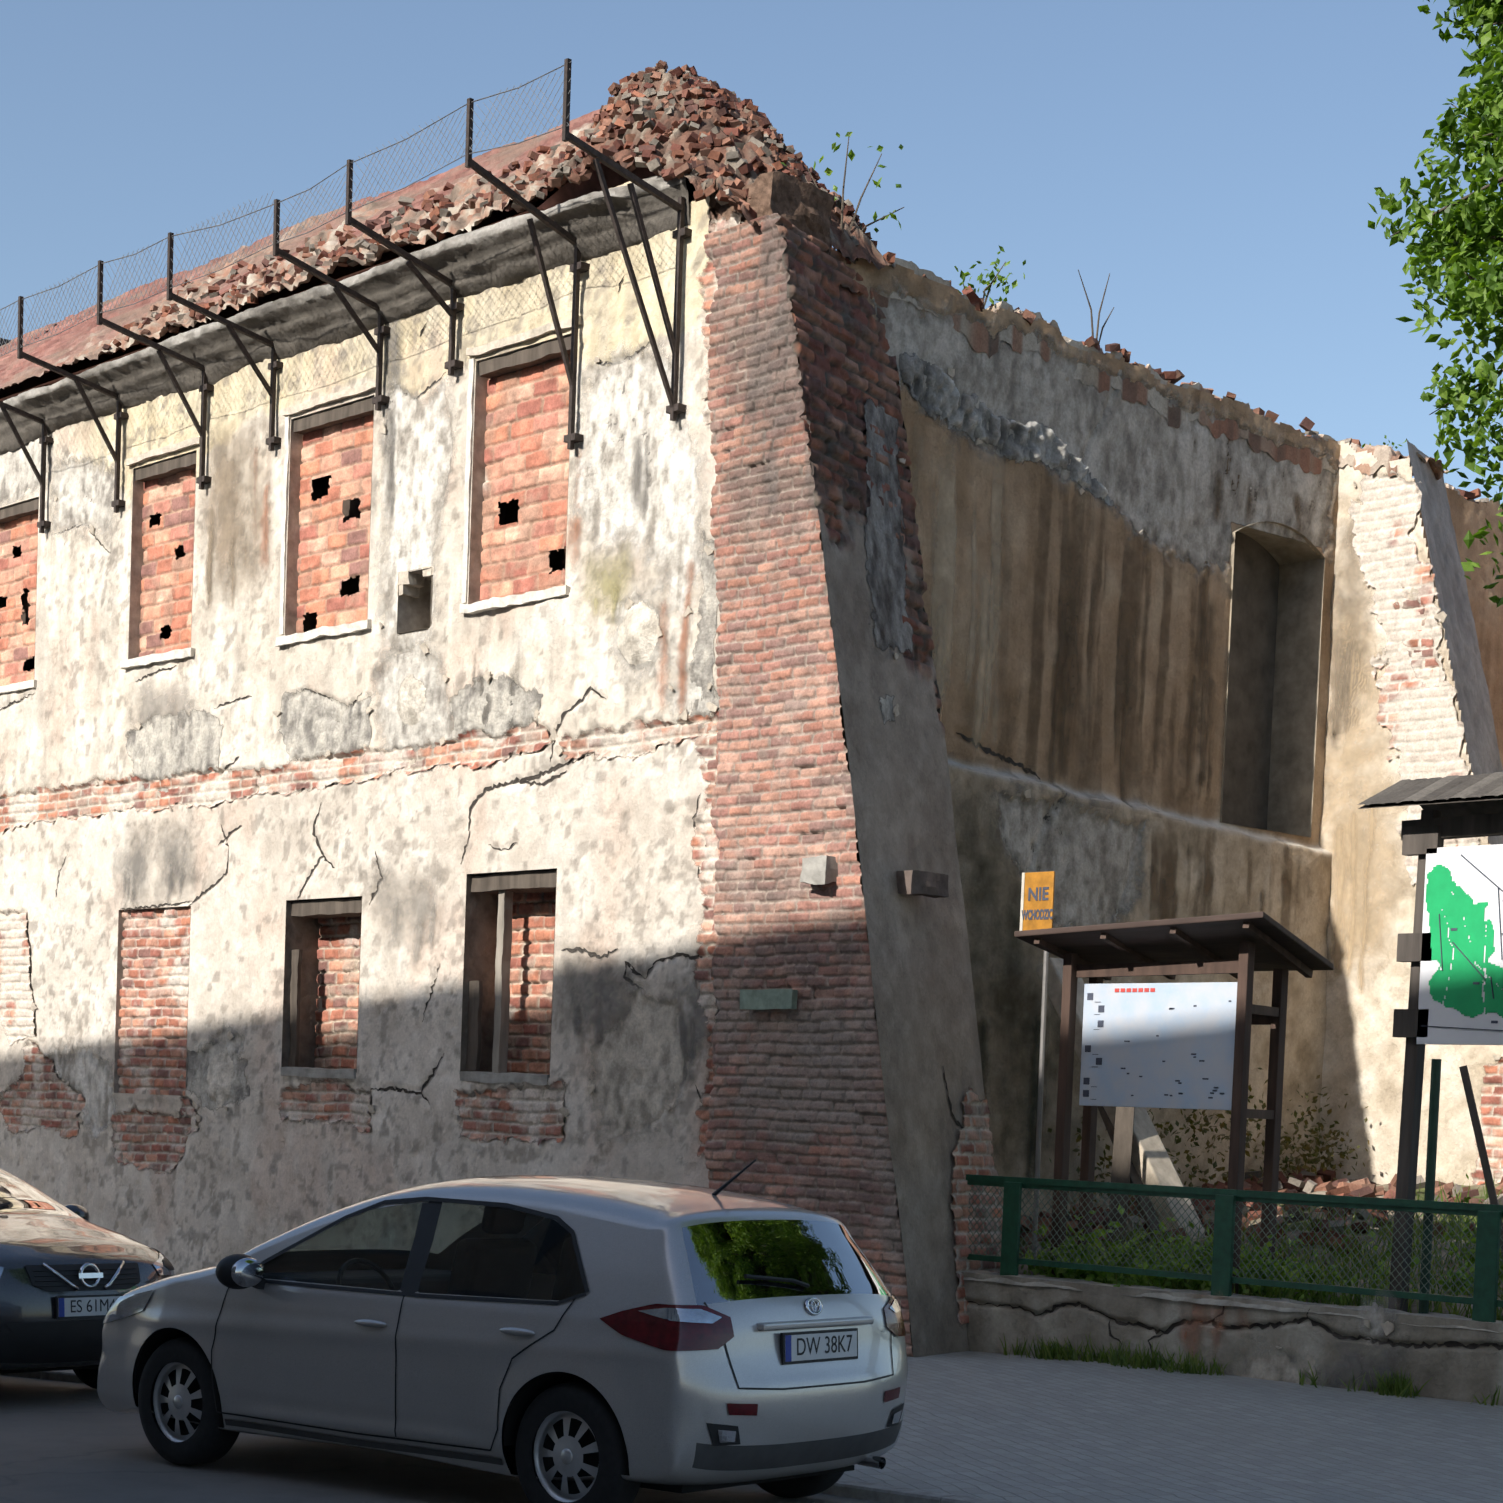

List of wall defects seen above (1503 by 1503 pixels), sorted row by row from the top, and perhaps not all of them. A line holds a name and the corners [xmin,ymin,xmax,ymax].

crack [297,782,339,900]
flaking render [0,255,724,1174]
crack [460,686,606,864]
water stain [932,470,1002,745]
flaking render [999,789,1145,927]
water stain [1029,515,1170,800]
flaking render [873,292,1470,781]
water stain [1188,561,1214,786]
water stain [1216,447,1251,516]
flaking render [1396,805,1423,834]
crack [561,947,702,990]
crack [968,1301,1503,1353]